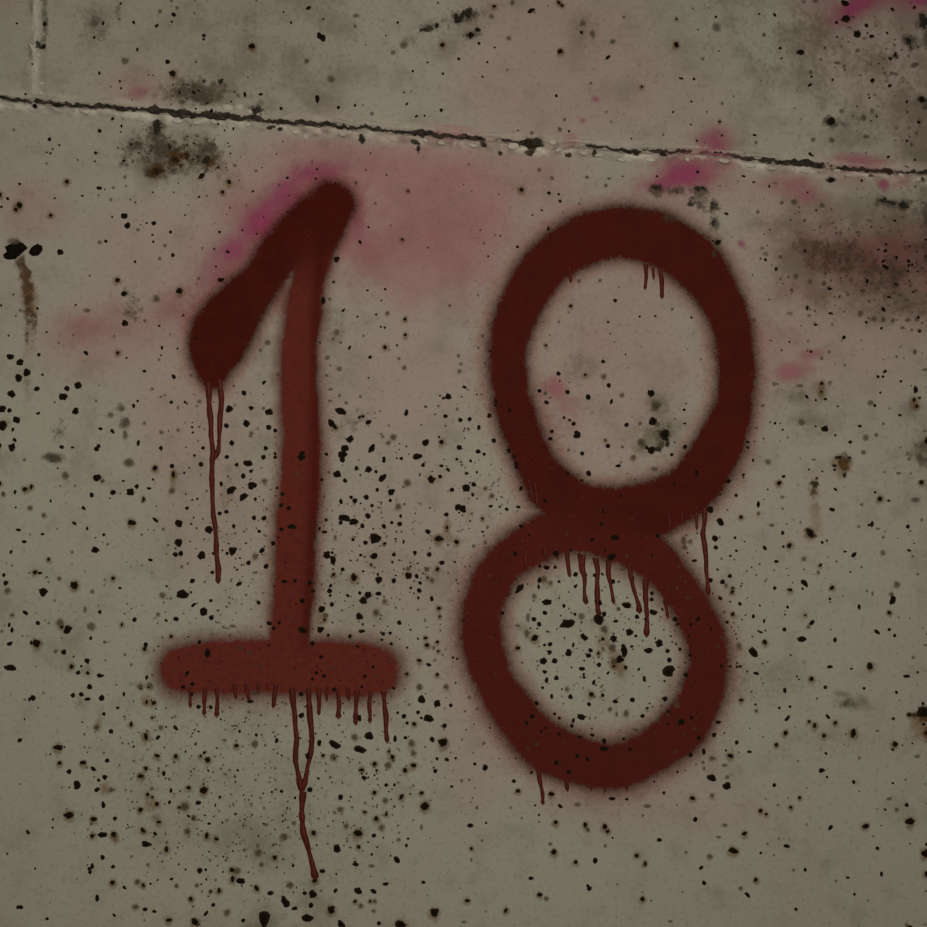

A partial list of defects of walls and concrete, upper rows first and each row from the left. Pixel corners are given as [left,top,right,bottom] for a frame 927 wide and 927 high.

water stain [902,13,927,47]
corrosion [808,16,926,153]
corrosion [0,256,48,357]